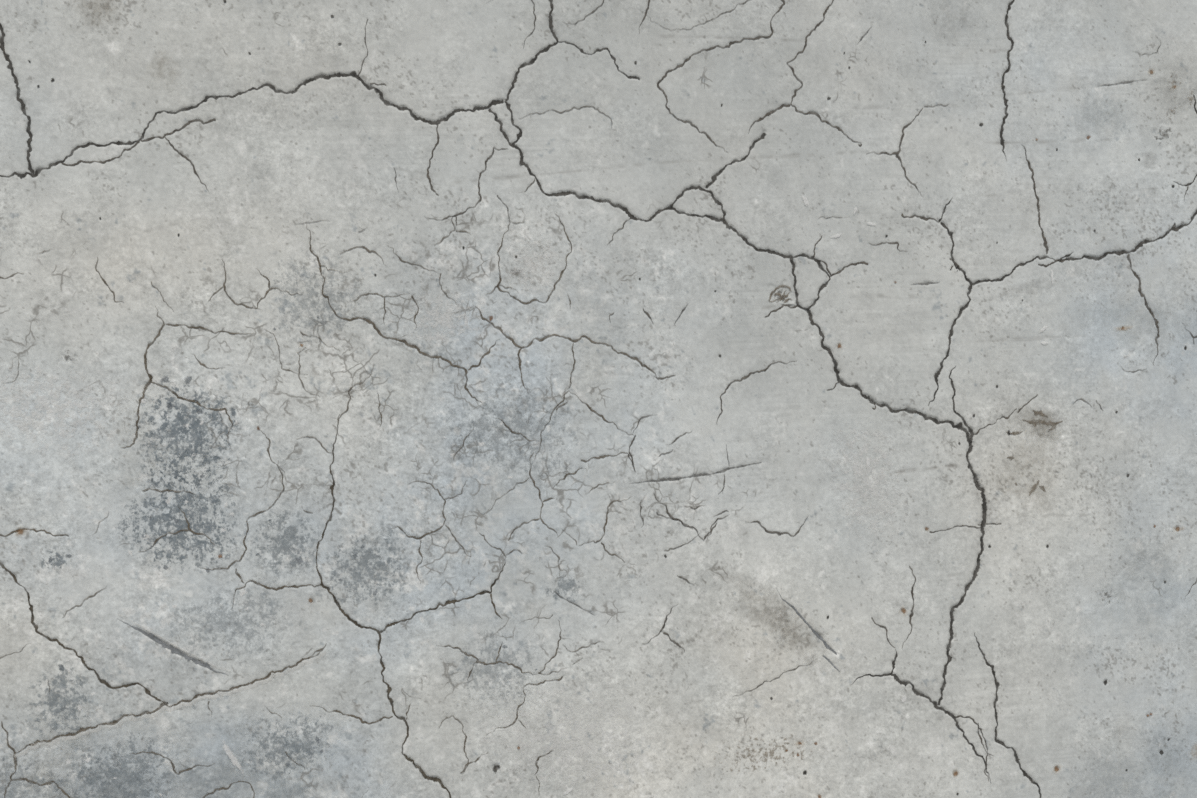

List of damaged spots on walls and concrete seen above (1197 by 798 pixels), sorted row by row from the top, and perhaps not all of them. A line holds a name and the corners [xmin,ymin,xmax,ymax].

crack [0,19,504,195]
crack [1000,0,1014,156]
crack [95,257,123,302]
crack [436,147,508,244]
crack [901,145,1197,406]
crack [121,281,340,448]
crack [487,0,1001,782]
crack [998,394,1038,419]
crack [139,488,215,552]
crack [200,226,729,798]
crack [0,517,326,798]
crack [974,634,1042,798]